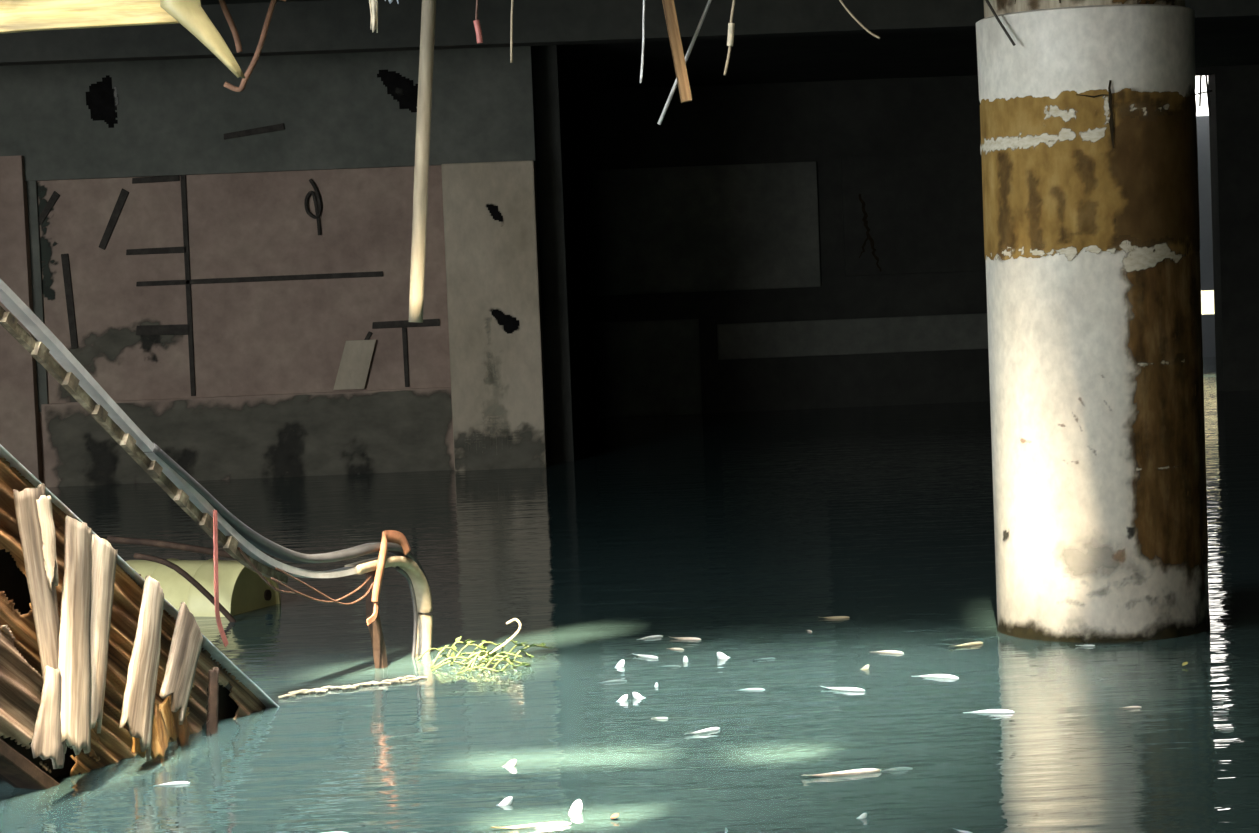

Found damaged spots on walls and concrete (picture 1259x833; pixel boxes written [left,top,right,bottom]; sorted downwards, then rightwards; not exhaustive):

flaking render [980,88,1200,272]